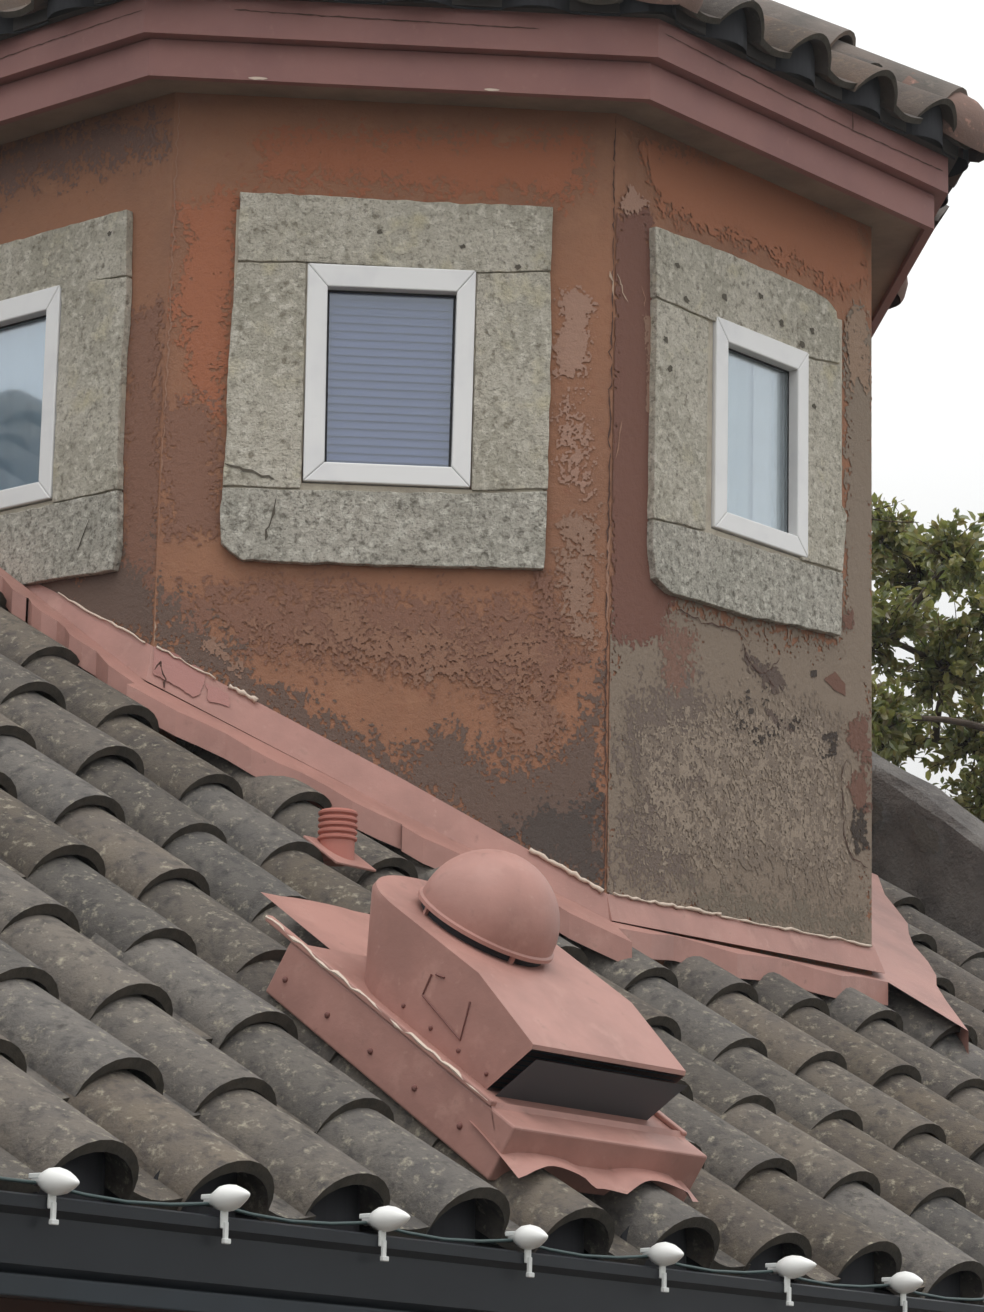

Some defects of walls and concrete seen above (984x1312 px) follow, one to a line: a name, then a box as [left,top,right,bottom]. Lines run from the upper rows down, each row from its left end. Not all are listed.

crack [225,463,276,540]
damp [40,197,884,944]
peeling [153,285,872,945]
peeling [729,945,865,973]